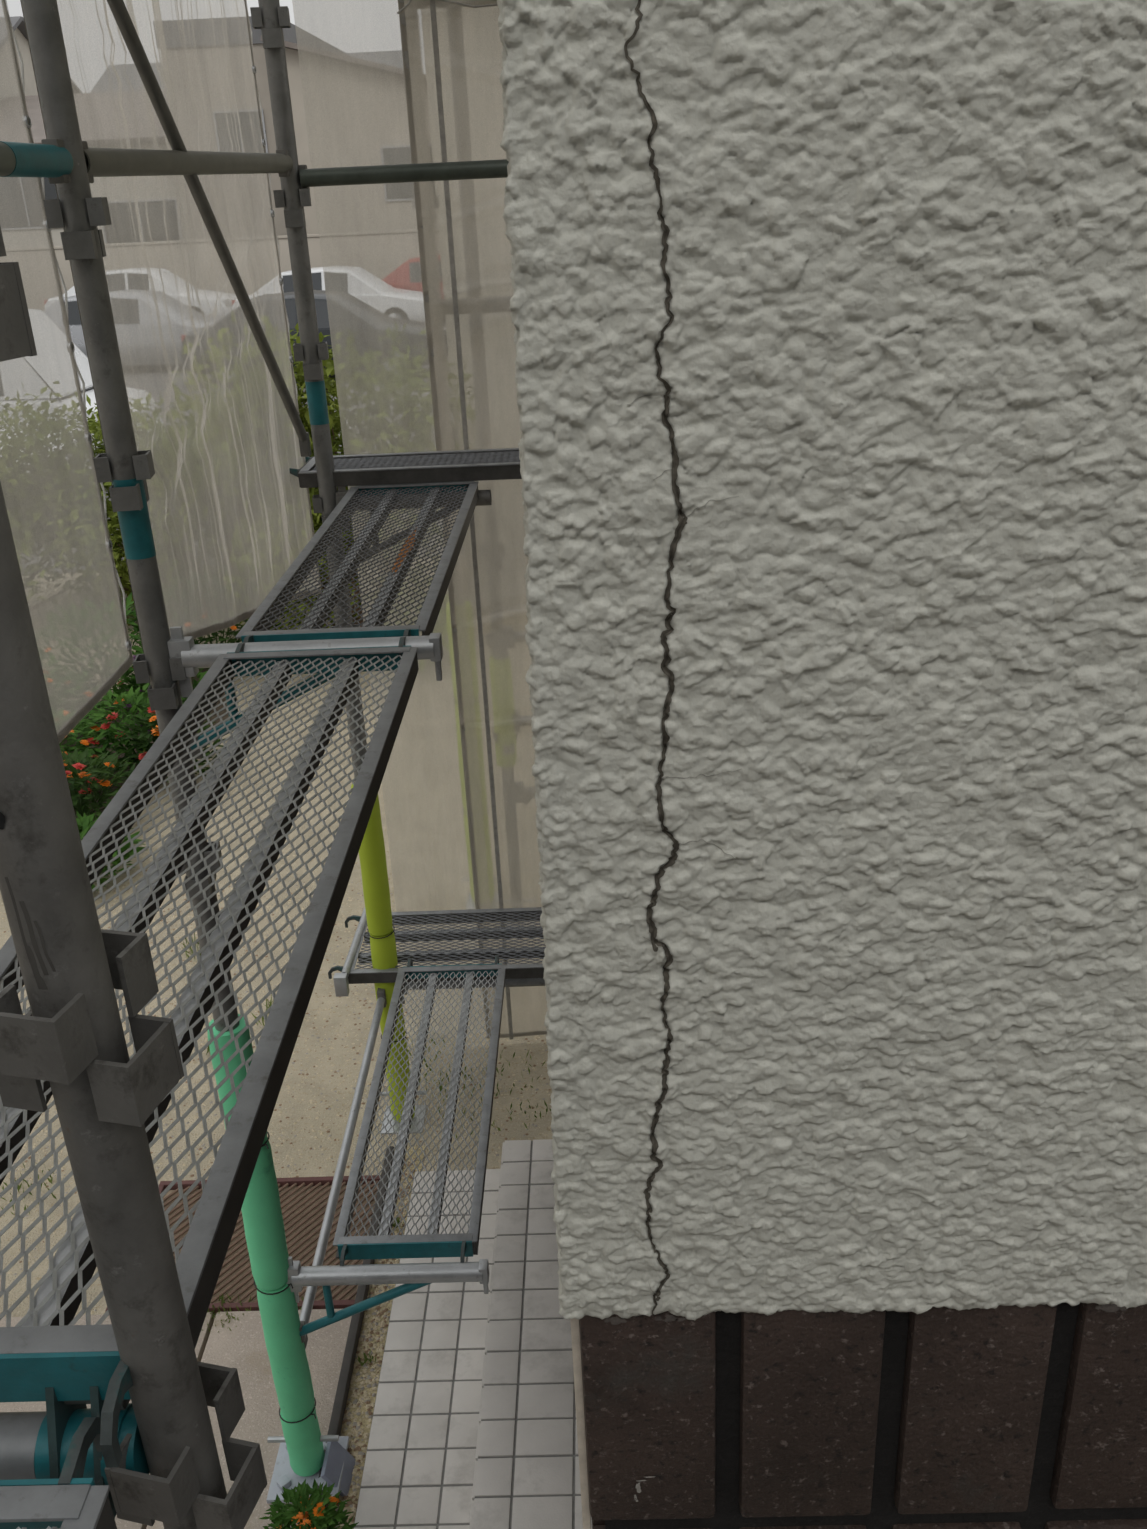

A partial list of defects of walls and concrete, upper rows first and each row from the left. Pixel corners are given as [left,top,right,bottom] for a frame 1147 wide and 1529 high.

crack [624,0,741,1316]